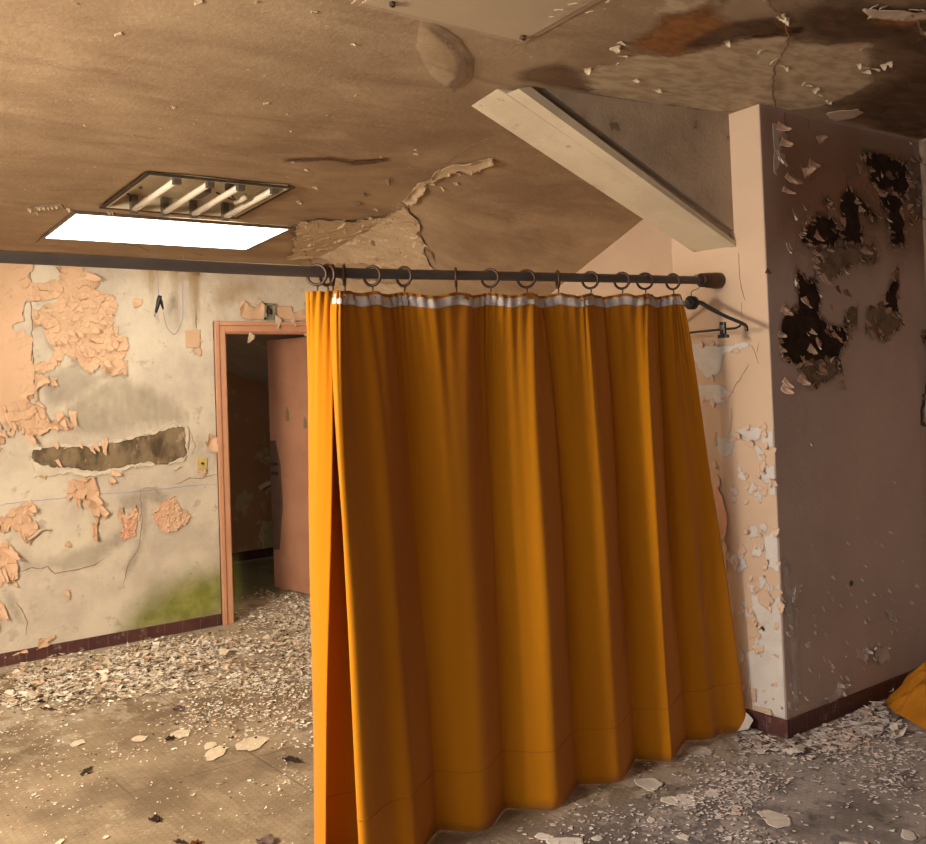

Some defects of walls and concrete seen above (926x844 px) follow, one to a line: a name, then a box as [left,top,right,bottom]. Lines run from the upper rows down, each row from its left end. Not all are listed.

rust [633,5,787,55]
peeling [583,14,893,121]
crack [765,0,790,133]
damp [808,1,926,132]
peeling [862,4,926,22]
peeling [772,120,821,194]
peeling [287,158,494,270]
peeling [315,277,404,294]
spalling [778,149,926,394]
peeling [0,263,191,542]
peeling [692,340,749,408]
peeling [712,422,786,732]